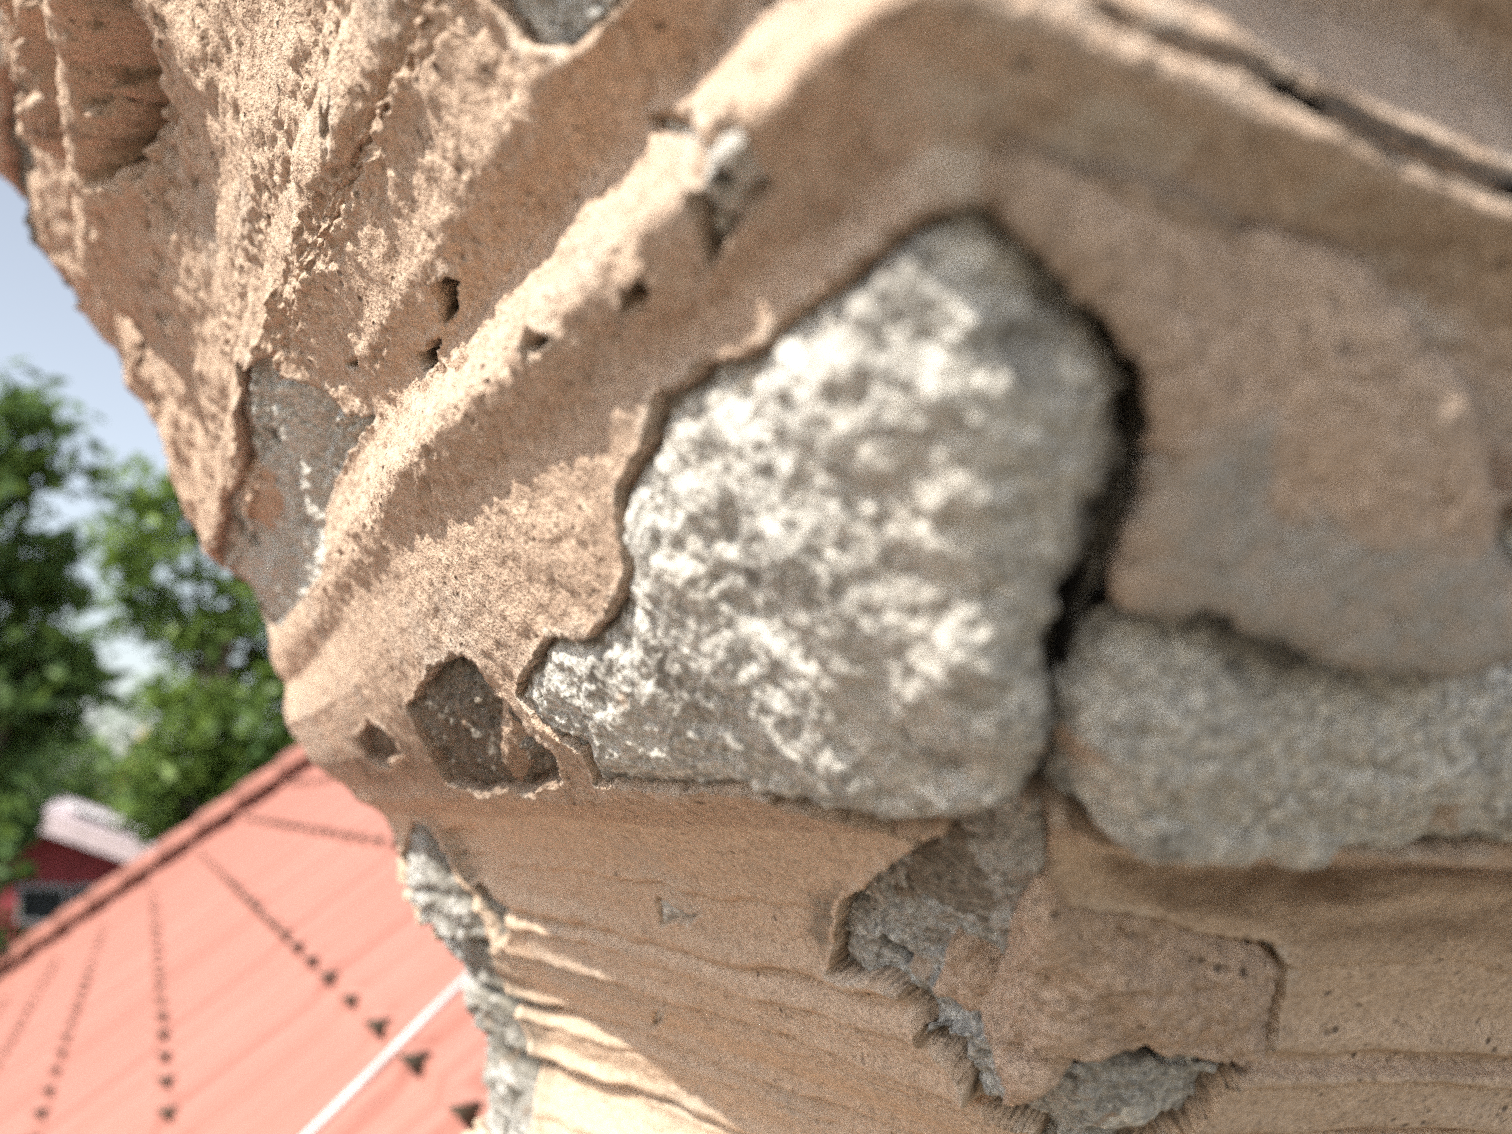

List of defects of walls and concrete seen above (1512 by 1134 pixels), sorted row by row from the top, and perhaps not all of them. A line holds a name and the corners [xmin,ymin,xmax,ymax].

spalling [516,0,623,47]
spalling [8,72,80,301]
spalling [222,355,376,629]
spalling [405,206,1512,1134]